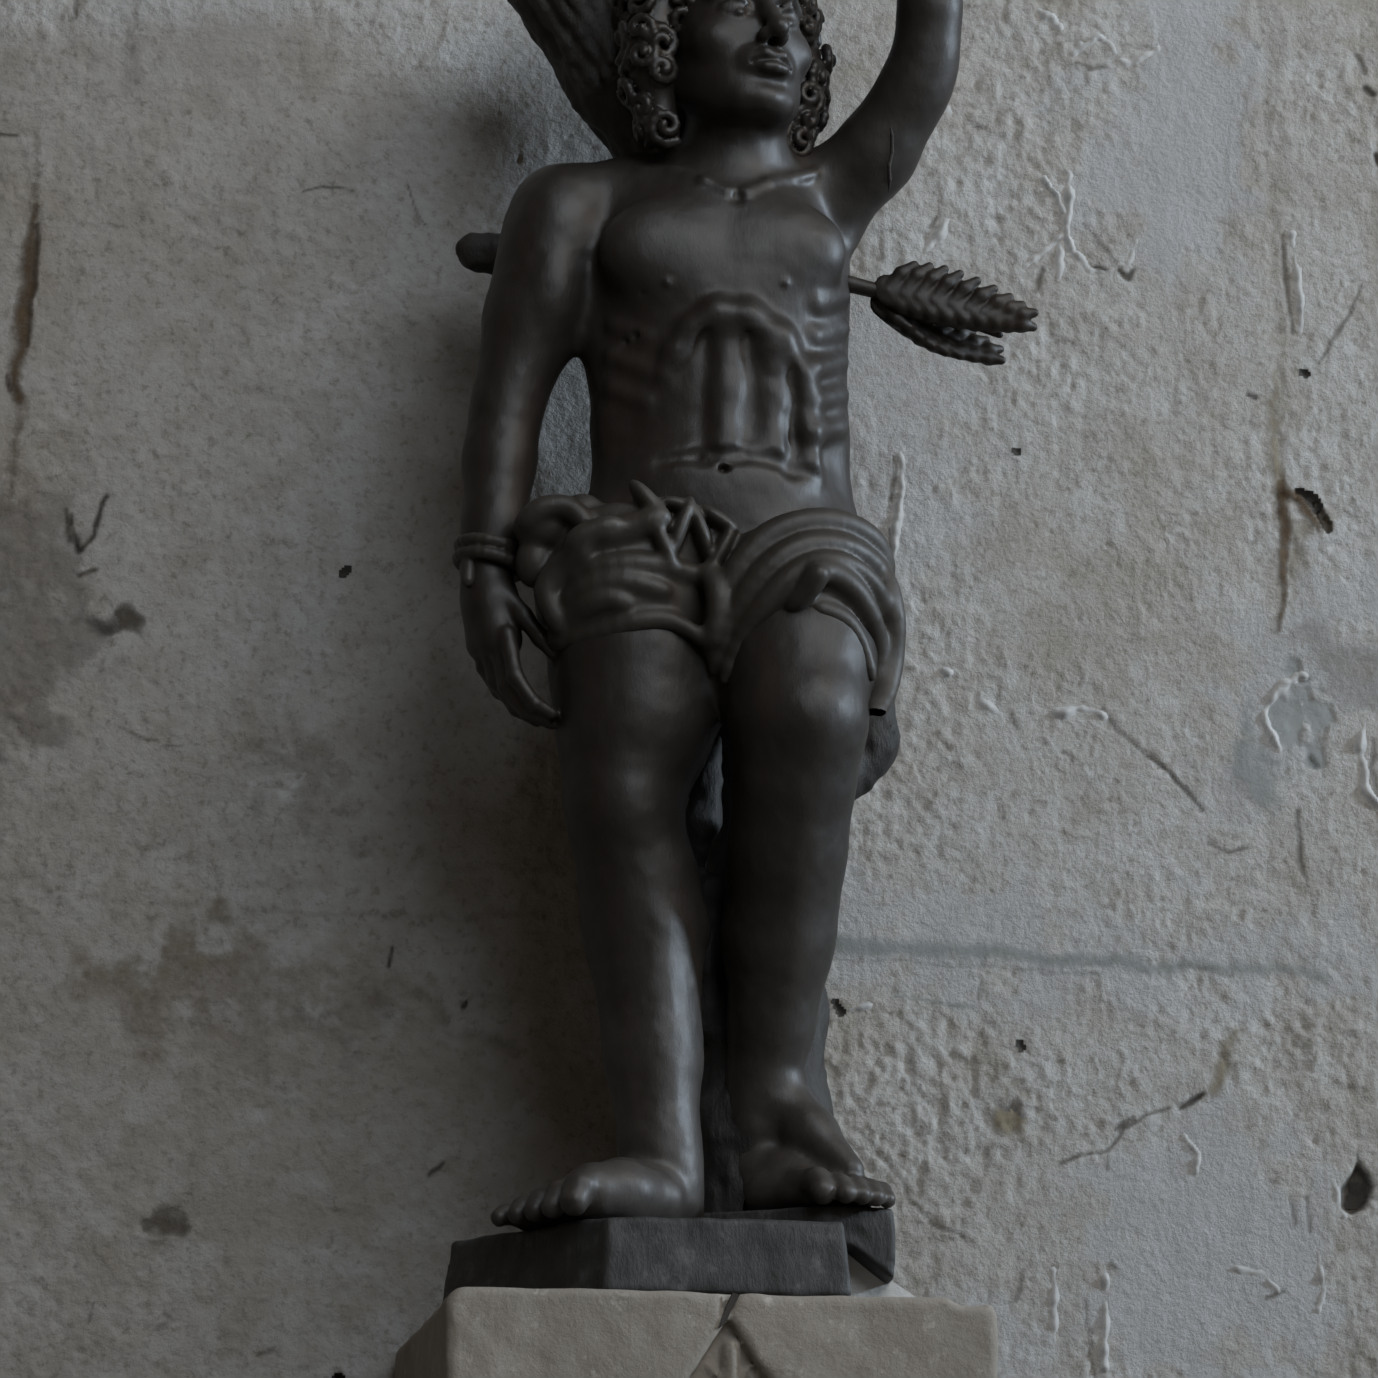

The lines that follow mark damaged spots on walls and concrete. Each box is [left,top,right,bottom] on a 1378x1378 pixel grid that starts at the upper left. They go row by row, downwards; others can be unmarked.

spalling [1118,239,1138,281]
spalling [1259,662,1332,767]
peeling [1353,722,1378,810]
spalling [1330,1156,1371,1220]